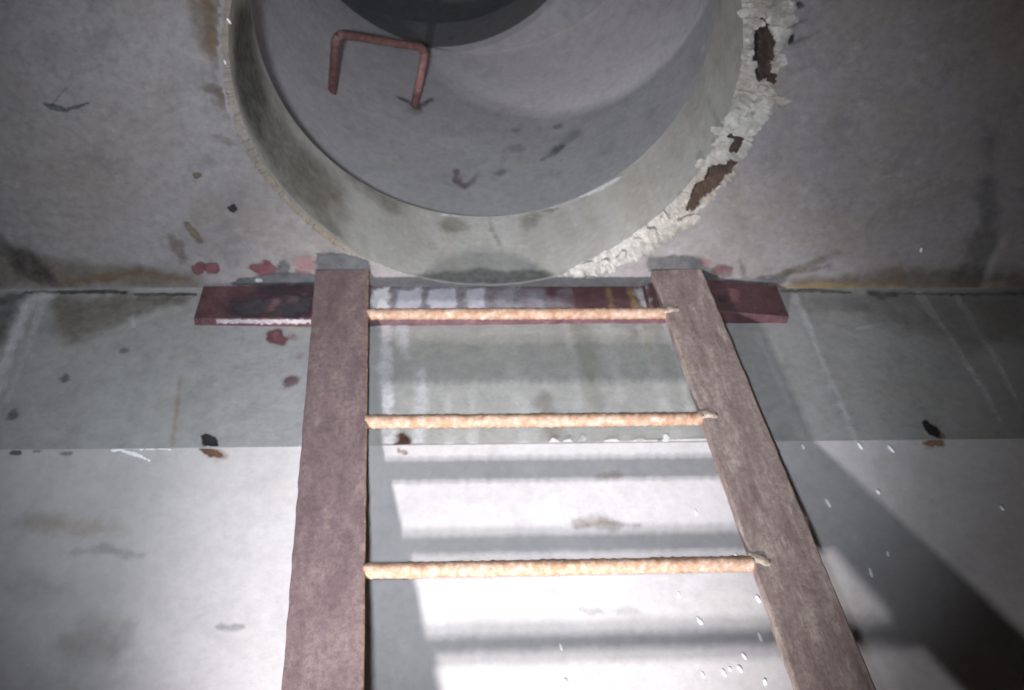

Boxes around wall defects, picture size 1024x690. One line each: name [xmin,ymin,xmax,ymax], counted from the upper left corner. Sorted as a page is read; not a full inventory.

spalling [563,0,802,279]
rust [200,449,222,458]